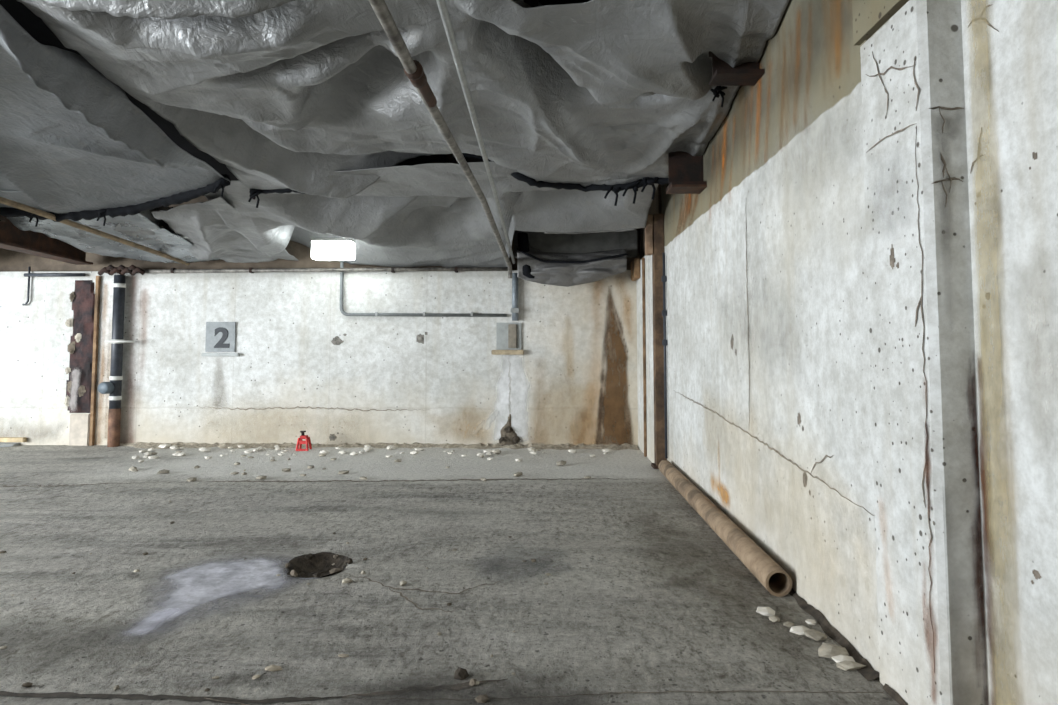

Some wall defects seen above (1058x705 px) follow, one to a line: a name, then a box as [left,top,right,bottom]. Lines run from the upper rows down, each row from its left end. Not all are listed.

crack [676,223,875,516]
crack [866,52,985,673]
leakage [133,559,311,635]
crack [0,678,508,705]
crack [533,690,883,698]